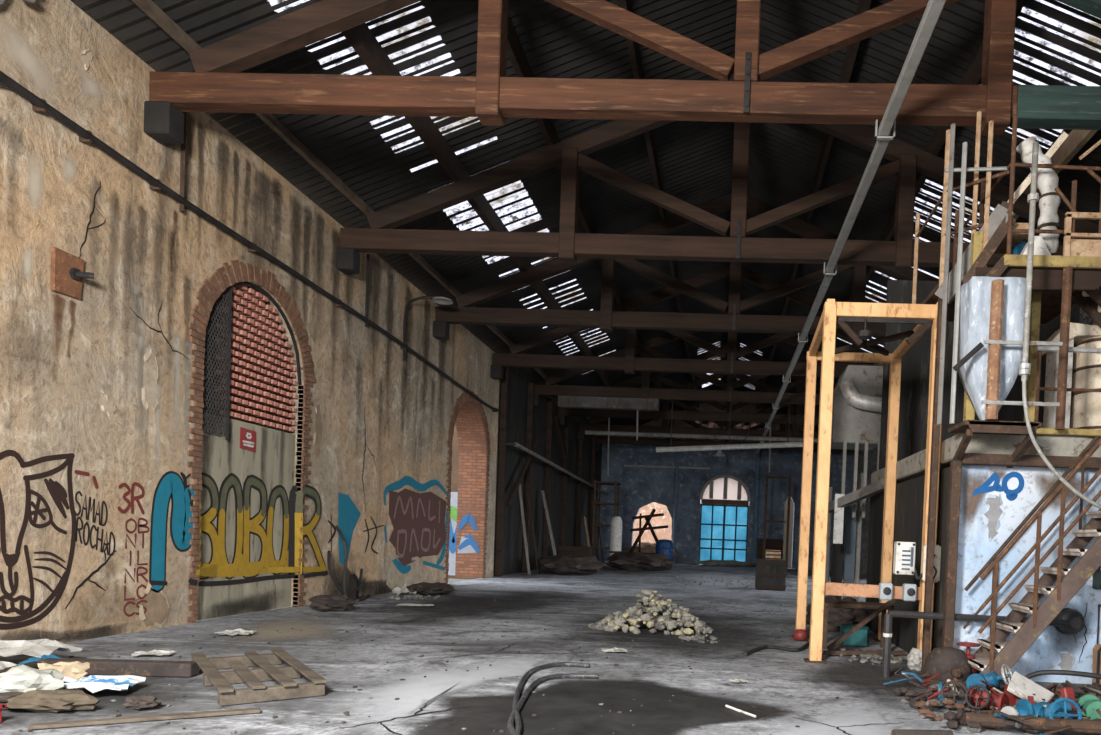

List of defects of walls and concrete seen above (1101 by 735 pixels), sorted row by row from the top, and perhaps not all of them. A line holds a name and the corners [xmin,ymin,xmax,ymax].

damp [186,113,204,176]
damp [220,142,281,216]
crack [79,181,106,258]
damp [293,200,352,318]
damp [964,470,1005,520]